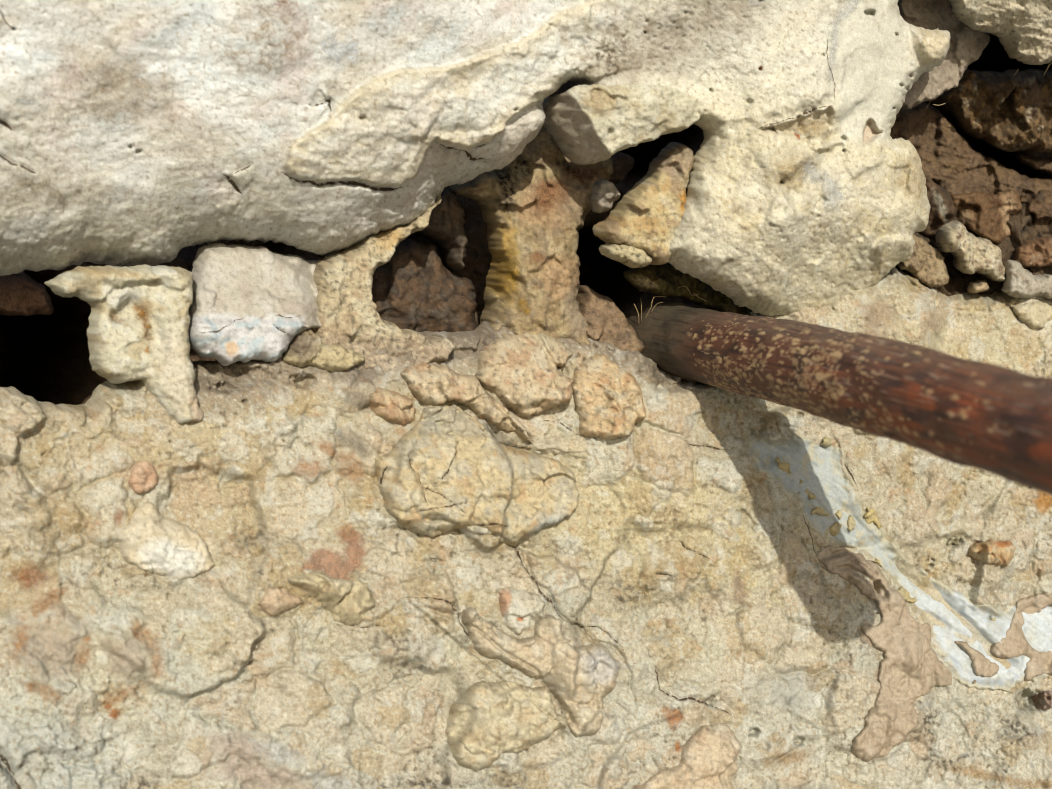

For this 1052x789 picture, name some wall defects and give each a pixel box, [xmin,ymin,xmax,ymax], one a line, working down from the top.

crack [380,444,507,527]
crack [405,597,469,636]
crack [516,551,625,654]
crack [655,662,732,716]
crack [0,755,21,789]